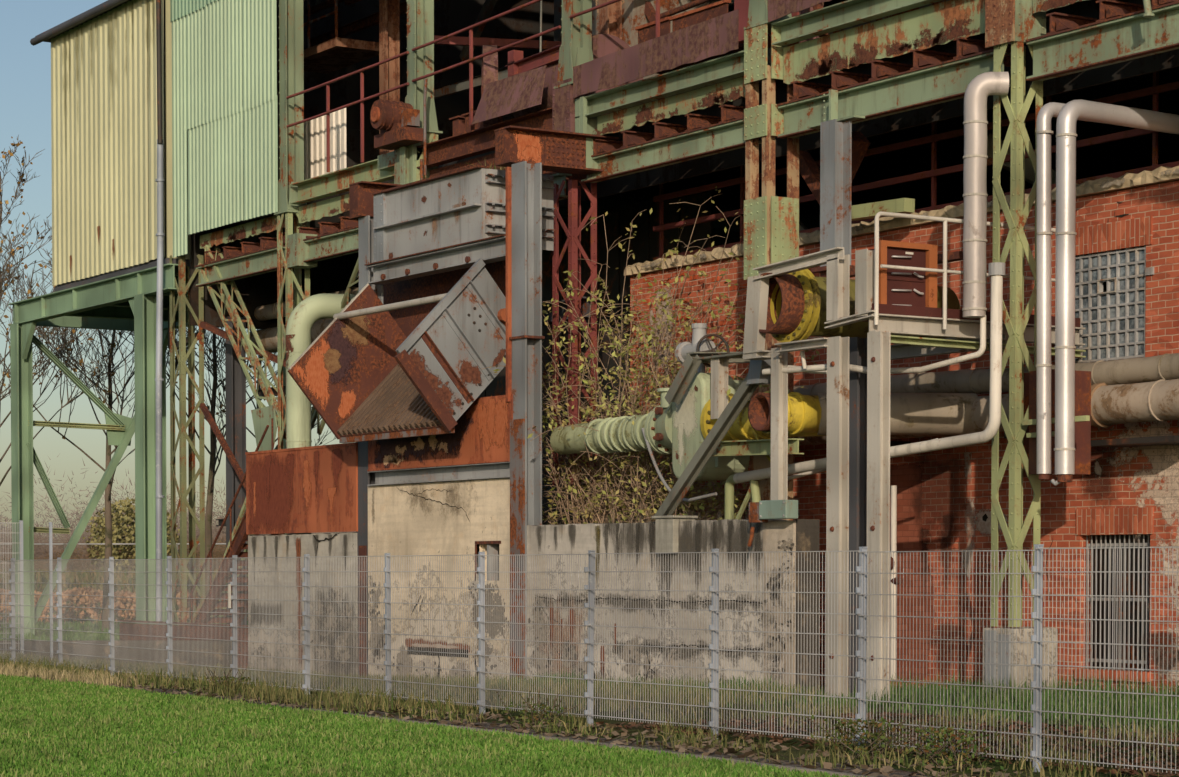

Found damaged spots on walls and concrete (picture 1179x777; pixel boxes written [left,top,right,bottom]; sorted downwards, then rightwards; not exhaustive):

rust [1040,0,1082,11]
rust [795,19,980,80]
rust [286,334,356,419]
rust [409,349,506,415]
rust [477,396,509,450]
rust [248,449,343,533]
water stain [537,516,762,619]
spalling [367,576,470,680]
water stain [613,640,759,661]
spalling [758,539,794,684]